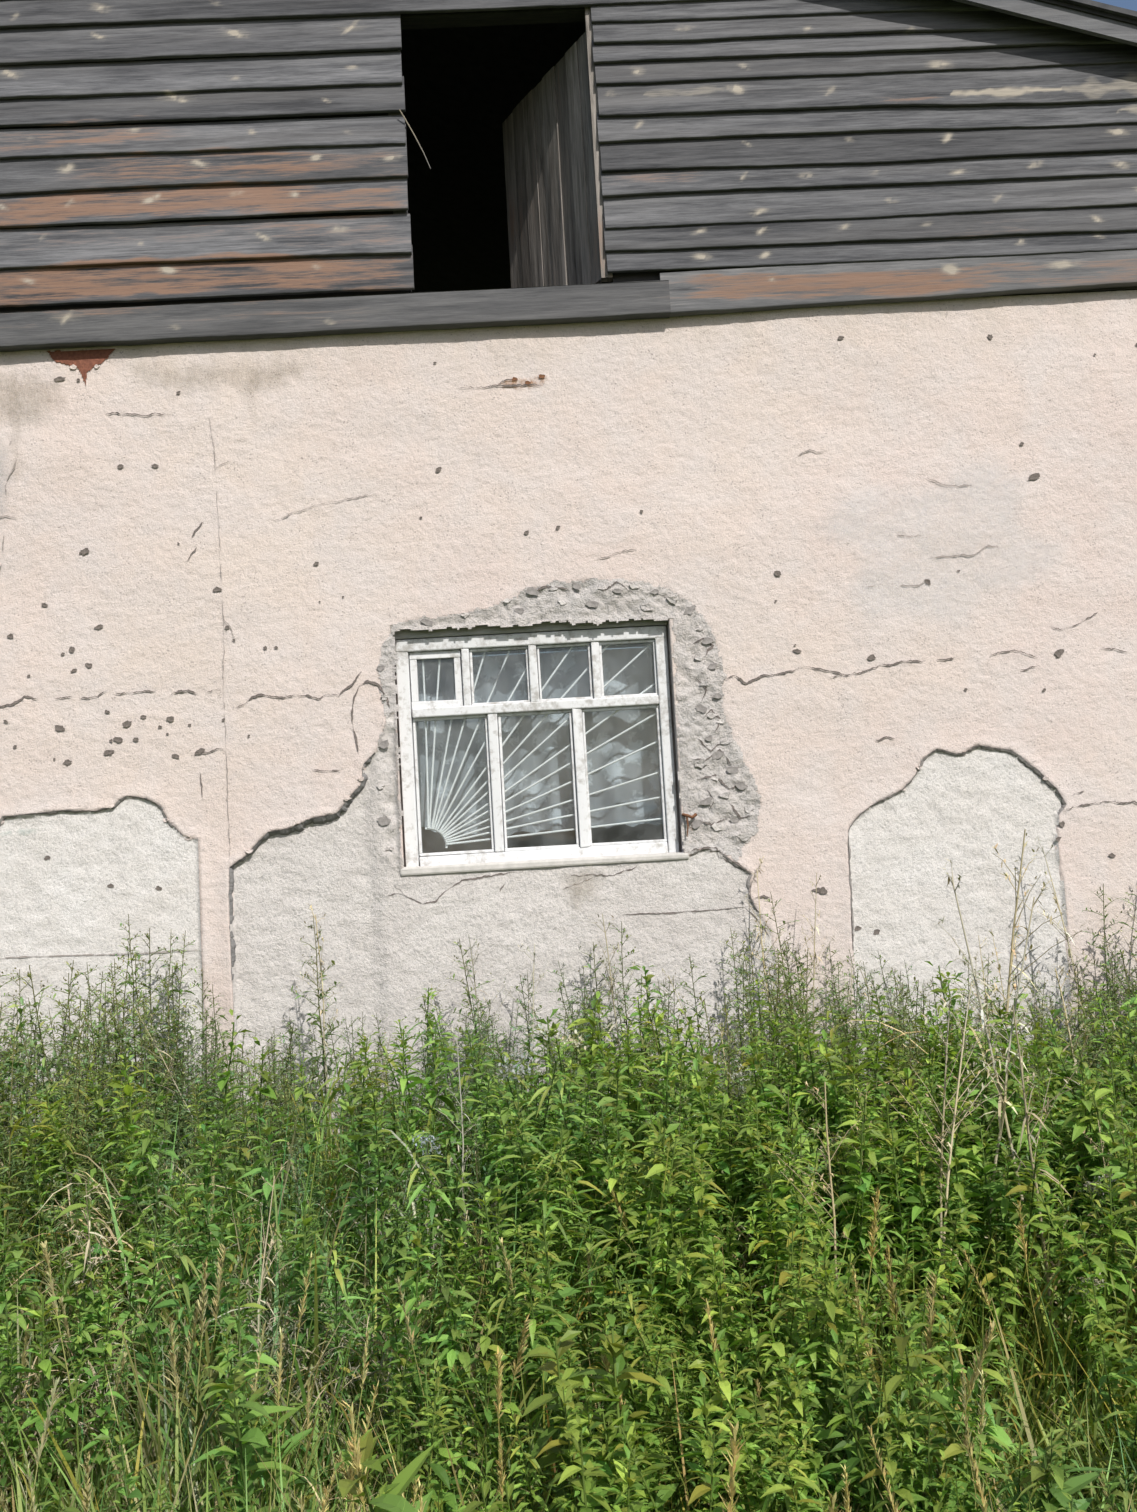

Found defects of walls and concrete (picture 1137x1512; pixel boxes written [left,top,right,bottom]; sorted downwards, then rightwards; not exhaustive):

flaking render [0,796,206,1143]
spalling [104,710,191,755]
crack [0,419,390,862]
flaking render [228,578,784,1139]
crack [727,658,953,684]
flaking render [848,745,1072,1098]
crack [992,613,1126,671]